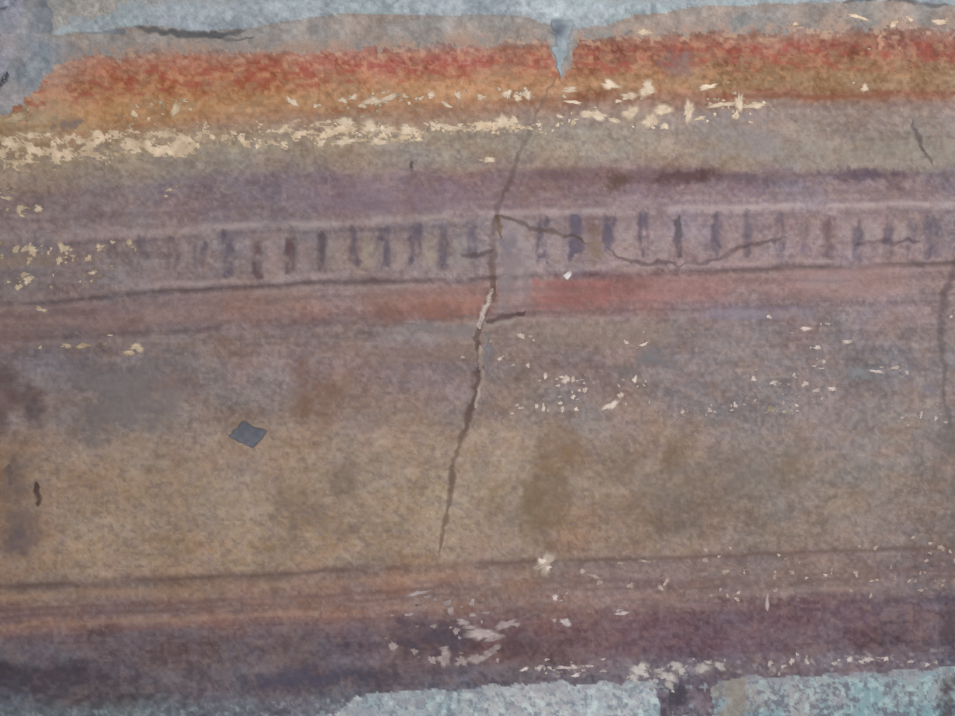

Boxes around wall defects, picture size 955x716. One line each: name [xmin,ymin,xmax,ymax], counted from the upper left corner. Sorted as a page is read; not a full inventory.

peeling [0,79,672,171]
peeling [684,81,775,123]
crack [468,288,526,414]
peeling [890,542,955,593]
peeling [390,590,520,666]
peeling [520,658,607,677]
peeling [626,658,726,692]